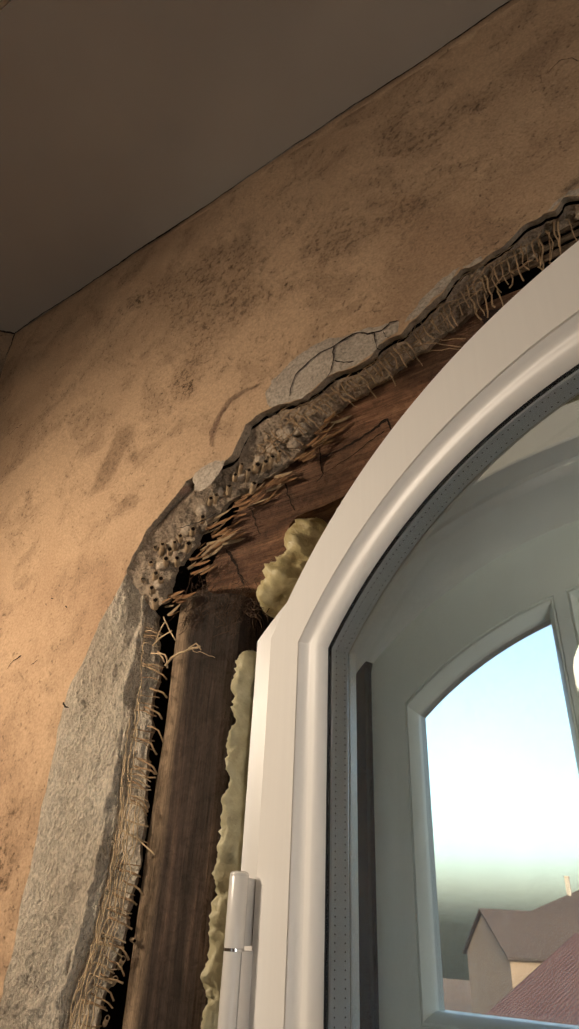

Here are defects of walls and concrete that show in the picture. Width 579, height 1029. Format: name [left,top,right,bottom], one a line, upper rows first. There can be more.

crack [0,0,511,372]
crack [289,320,398,396]
spalling [128,204,579,609]
crack [316,418,392,483]
spalling [0,573,163,1029]